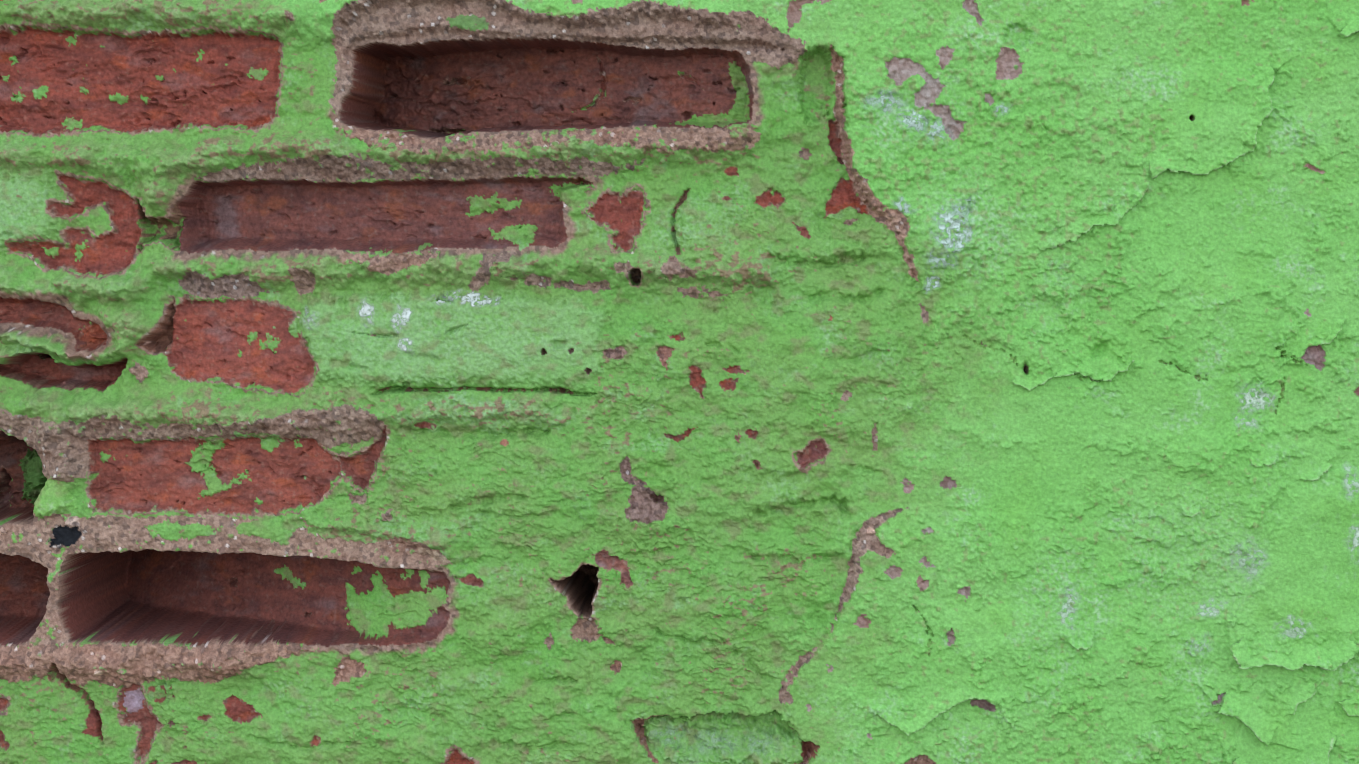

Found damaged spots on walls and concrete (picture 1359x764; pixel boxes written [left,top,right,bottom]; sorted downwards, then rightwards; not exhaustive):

flaking render [0,25,283,136]
spalling [179,0,832,296]
flaking render [824,43,920,283]
flaking render [6,174,143,279]
peeling [687,364,750,399]
spalling [0,271,488,764]
peeling [619,455,670,527]
spalling [544,616,623,676]
flaking render [779,478,915,712]
flaking render [629,715,670,764]
flaking render [796,741,820,764]
flaking render [904,755,936,764]